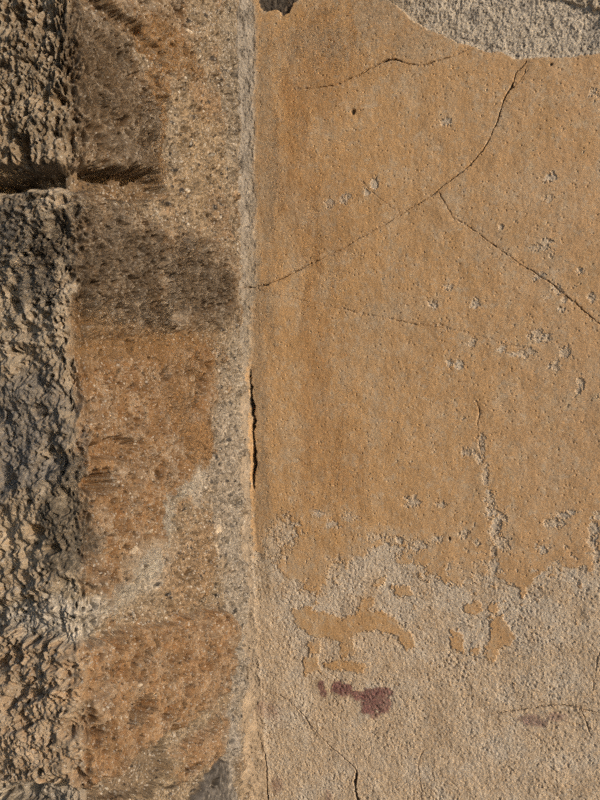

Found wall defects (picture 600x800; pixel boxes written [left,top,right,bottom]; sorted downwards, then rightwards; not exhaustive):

flaking render [388,0,600,60]
crack [293,43,468,90]
crack [242,60,600,348]
crack [249,368,258,489]
flaking render [251,432,600,800]
crack [592,651,600,691]
crack [490,704,600,736]